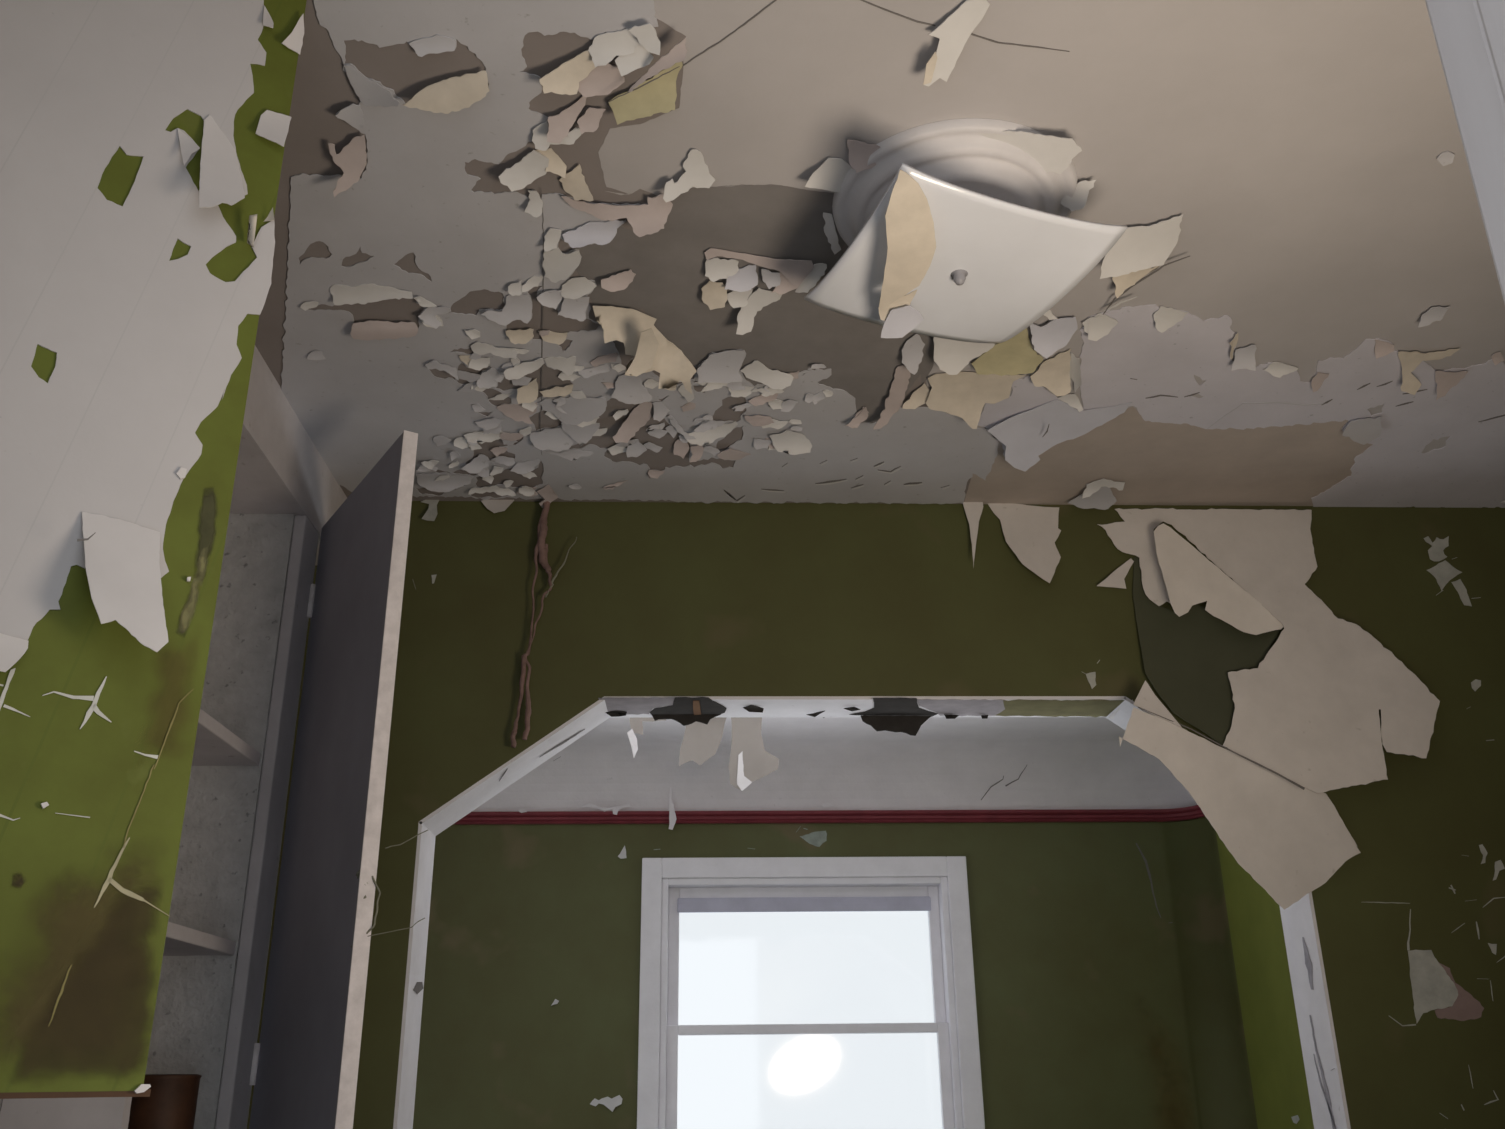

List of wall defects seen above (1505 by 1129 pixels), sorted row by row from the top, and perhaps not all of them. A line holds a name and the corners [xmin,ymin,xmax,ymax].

peeling [0,0,1505,672]
peeling [1082,660,1100,689]
crack [0,676,111,729]
spalling [650,697,764,726]
spalling [844,698,959,736]
crack [94,689,194,917]
crack [48,965,72,1027]
damp [6,866,156,1075]
peeling [134,1084,151,1093]